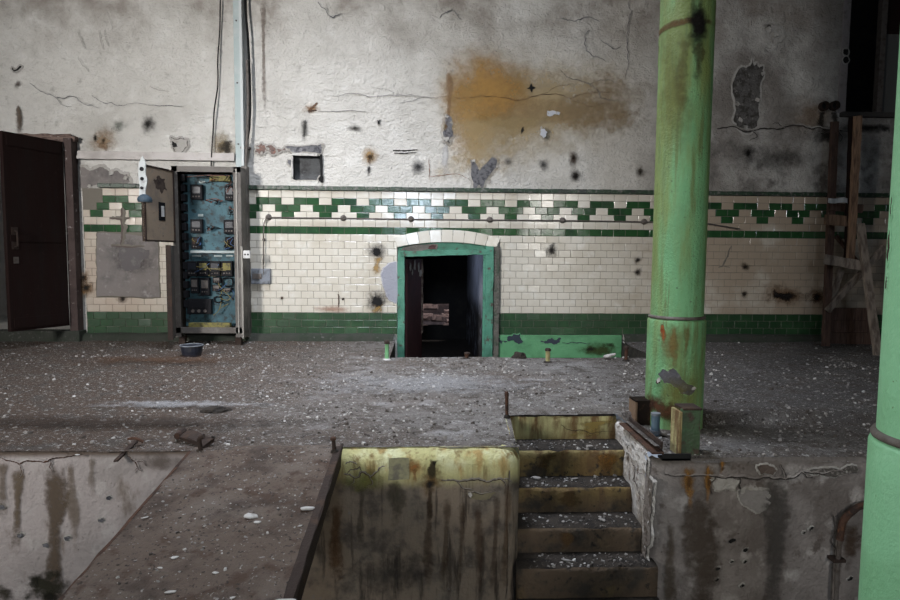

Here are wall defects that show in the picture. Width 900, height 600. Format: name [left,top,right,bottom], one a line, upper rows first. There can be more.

crack [30,82,180,108]
crack [325,69,617,112]
flaking render [731,57,766,135]
crack [717,122,848,142]
peeling [78,164,133,191]
peeling [499,333,523,344]
peeling [654,366,696,397]
crack [344,461,384,487]
crack [665,465,846,494]
spalling [621,436,867,600]
water stain [25,572,65,600]